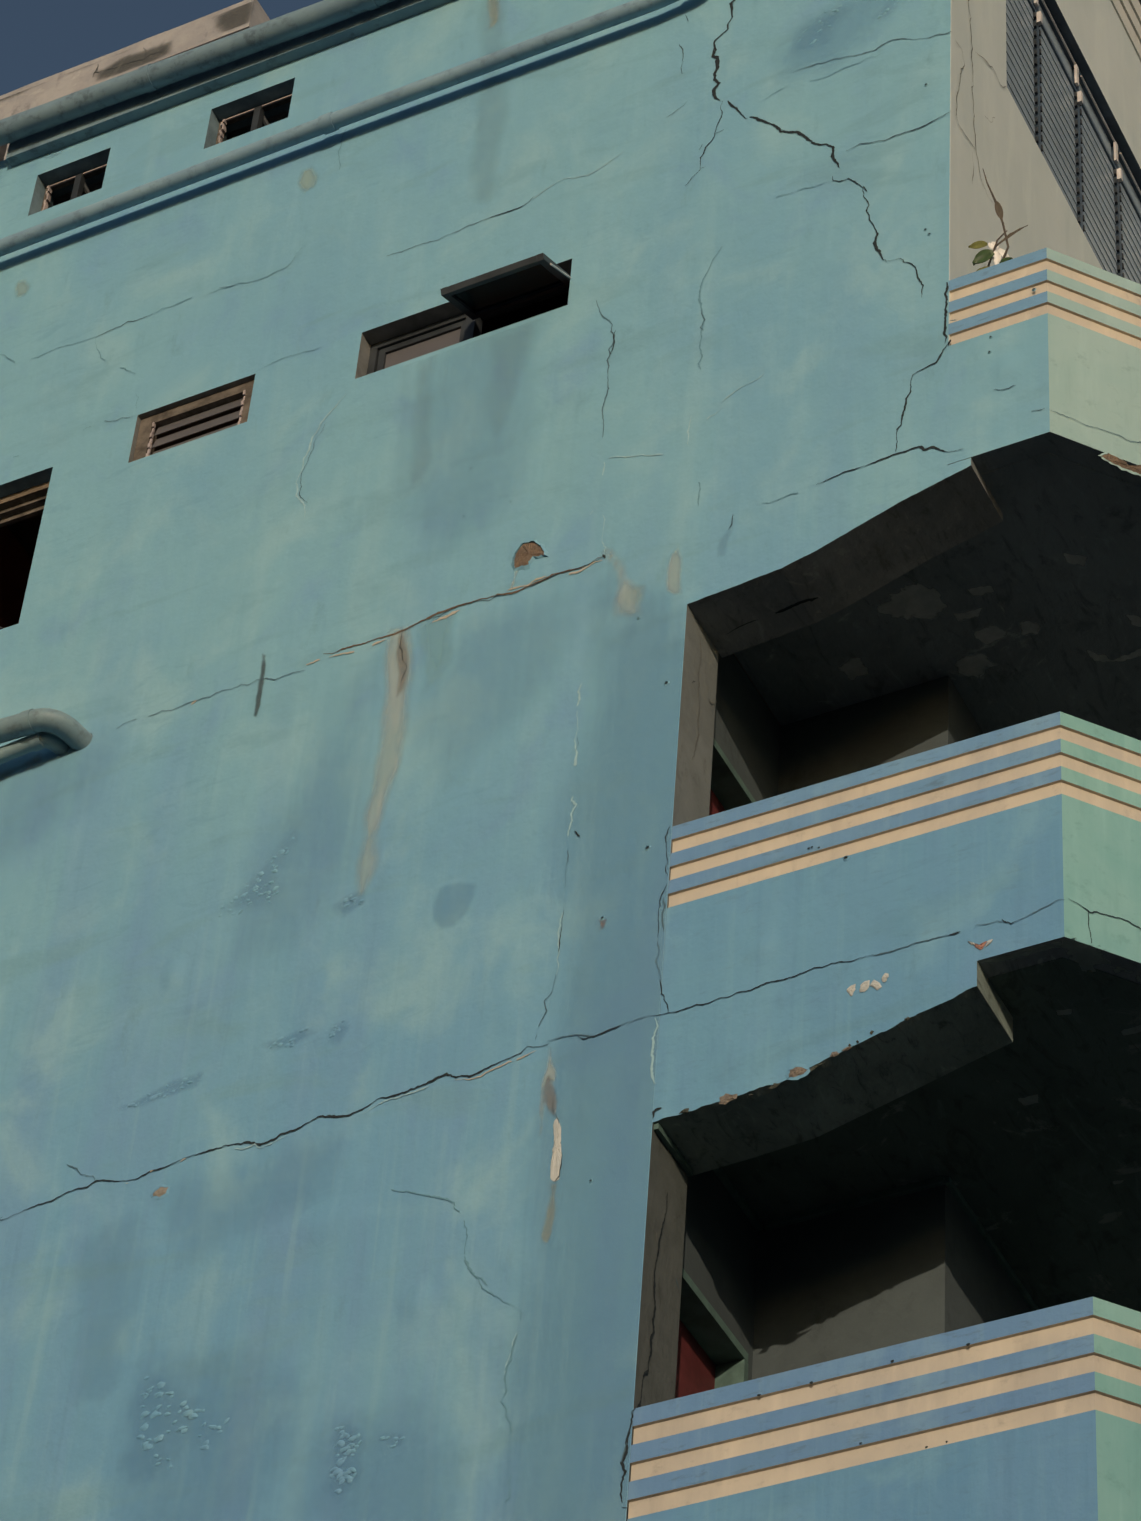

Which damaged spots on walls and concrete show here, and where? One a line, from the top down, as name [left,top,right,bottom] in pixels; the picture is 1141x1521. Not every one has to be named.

crack [669,0,1006,528]
crack [295,394,346,519]
crack [596,300,763,475]
spalling [1098,452,1141,476]
crack [118,511,606,728]
spalling [511,540,548,588]
leakage [362,632,409,887]
crack [0,683,1141,1220]
peeling [846,973,889,996]
peeling [550,1118,562,1181]
crack [391,1189,521,1433]